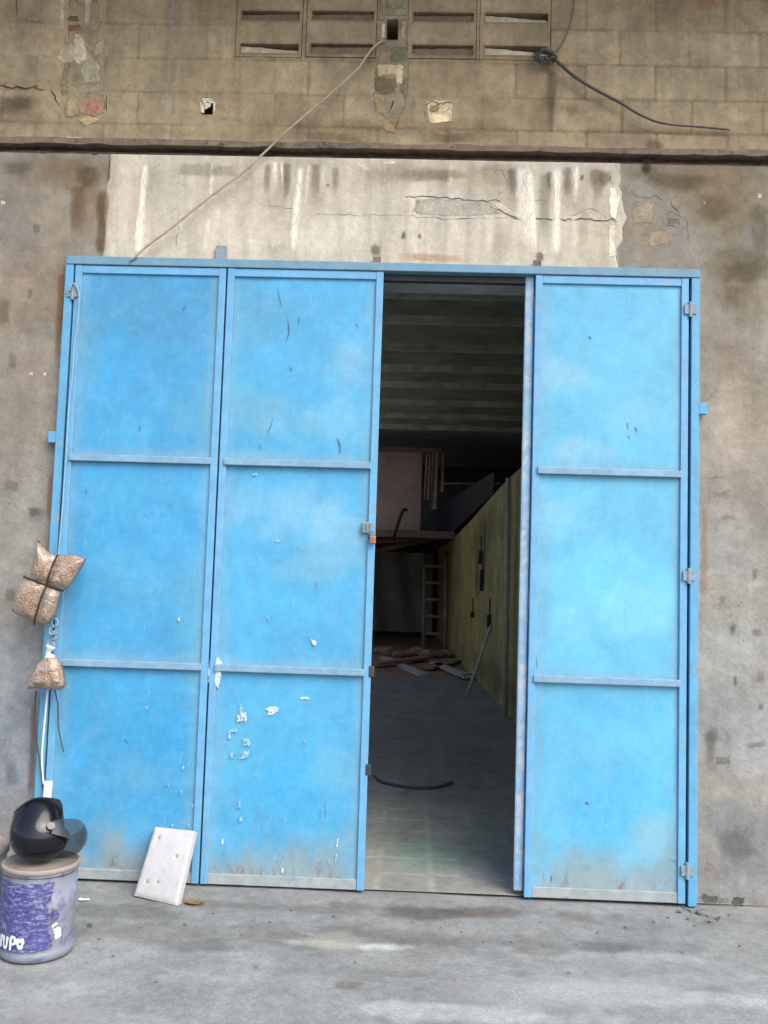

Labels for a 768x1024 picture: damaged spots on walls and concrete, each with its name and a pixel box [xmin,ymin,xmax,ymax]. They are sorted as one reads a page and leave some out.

crack [0,0,109,121]
peeling [57,0,105,125]
peeling [375,0,407,99]
spalling [424,99,453,123]
leakage [266,162,303,247]
crack [325,169,627,223]
leakage [511,171,536,247]
leakage [553,167,578,251]
peeling [609,172,689,258]